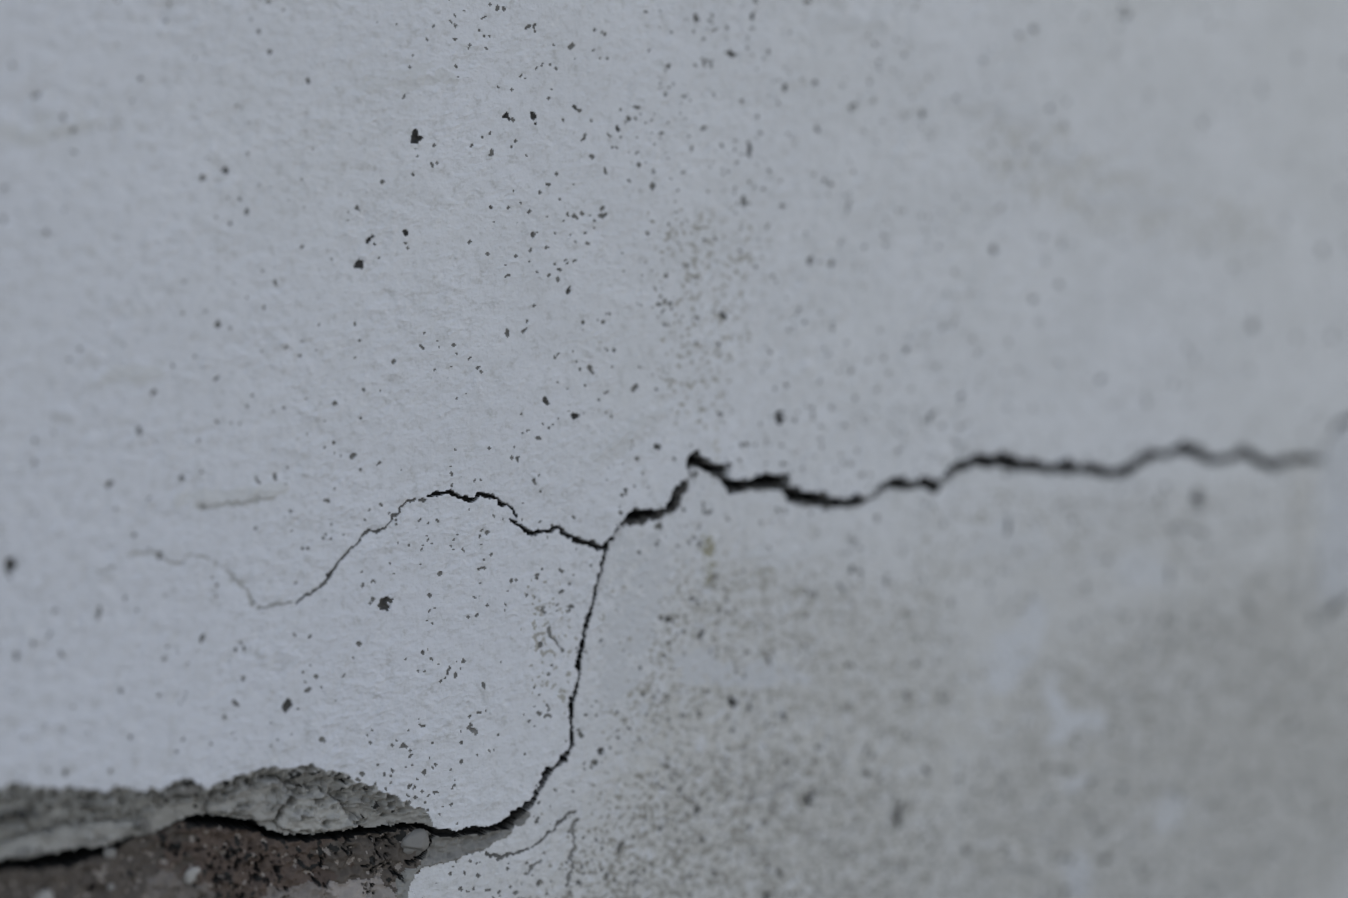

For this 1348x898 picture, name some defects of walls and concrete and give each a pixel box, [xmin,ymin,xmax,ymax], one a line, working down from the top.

spalling [0,764,531,898]
crack [96,443,1323,887]